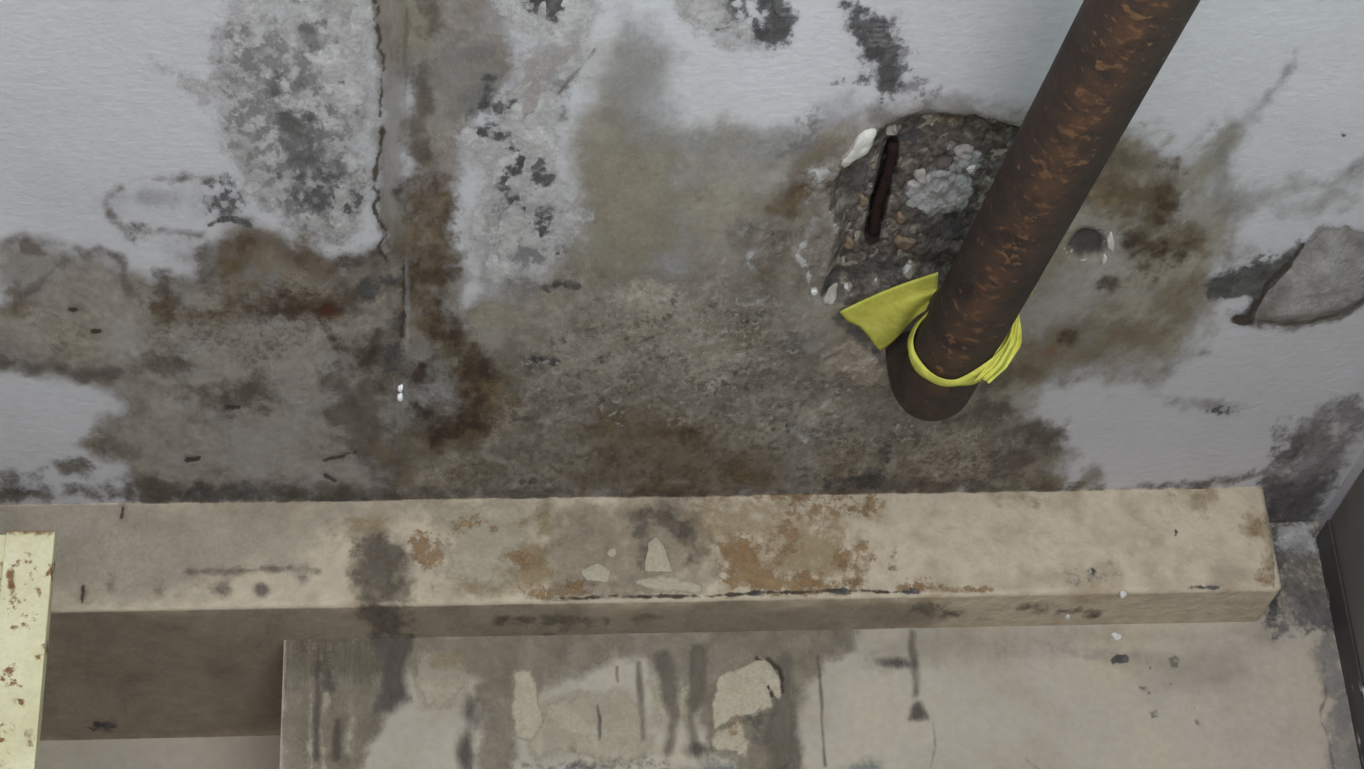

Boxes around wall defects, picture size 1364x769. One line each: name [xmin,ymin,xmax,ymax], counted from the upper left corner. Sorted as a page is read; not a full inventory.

crack [372,0,407,338]
leakage [0,0,1235,603]
spalling [708,109,1020,443]
corrosion [1086,140,1205,270]
corrosion [971,324,1092,479]
corrosion [408,498,595,600]
corrosion [704,493,993,597]
leakage [1148,395,1364,639]
leakage [41,533,958,769]
peeling [511,670,663,766]
peeling [677,686,692,718]
peeling [709,657,784,769]